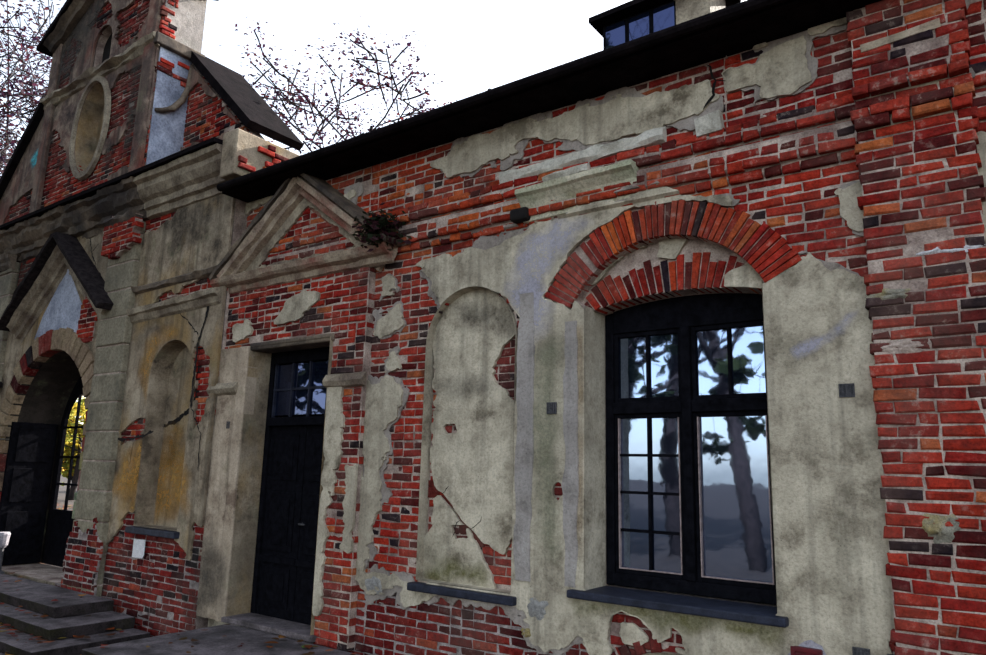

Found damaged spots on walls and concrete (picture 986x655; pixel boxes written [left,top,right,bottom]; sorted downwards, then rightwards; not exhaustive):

flaking render [89,0,179,47]
flaking render [152,57,252,148]
crack [703,65,725,110]
flaking render [4,66,142,223]
flaking render [101,211,176,260]
flaking render [159,277,212,302]
flaking render [225,30,868,655]
crack [118,306,209,467]
flaking render [194,346,219,425]
flaking render [121,418,146,445]
crack [428,480,485,548]
flaking render [55,512,204,637]